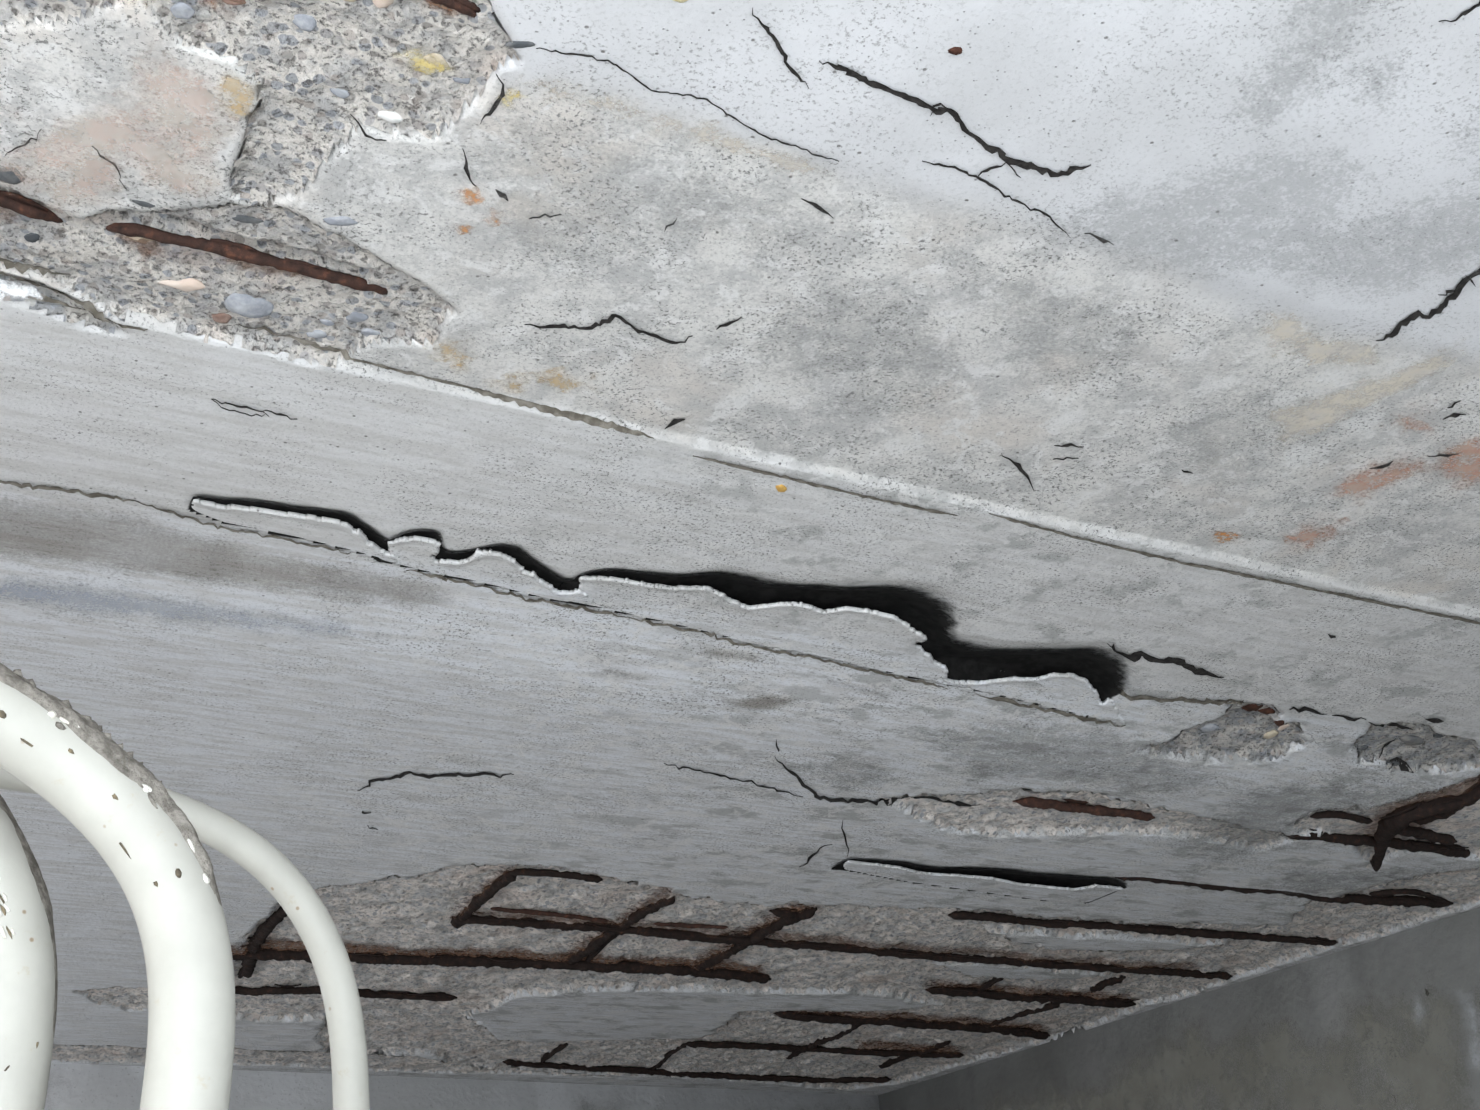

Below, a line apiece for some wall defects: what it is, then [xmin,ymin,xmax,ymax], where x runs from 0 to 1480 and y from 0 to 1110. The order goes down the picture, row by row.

spalling [0,0,535,368]
crack [752,8,1114,245]
crack [1376,268,1480,341]
crack [188,496,1224,726]
spalling [1132,701,1305,763]
crack [664,739,1128,904]
rust [231,938,306,955]
spalling [233,904,331,1068]
rust [345,869,1194,975]
spalling [315,722,1480,1090]
rust [857,1040,959,1054]
rust [793,1011,1044,1032]